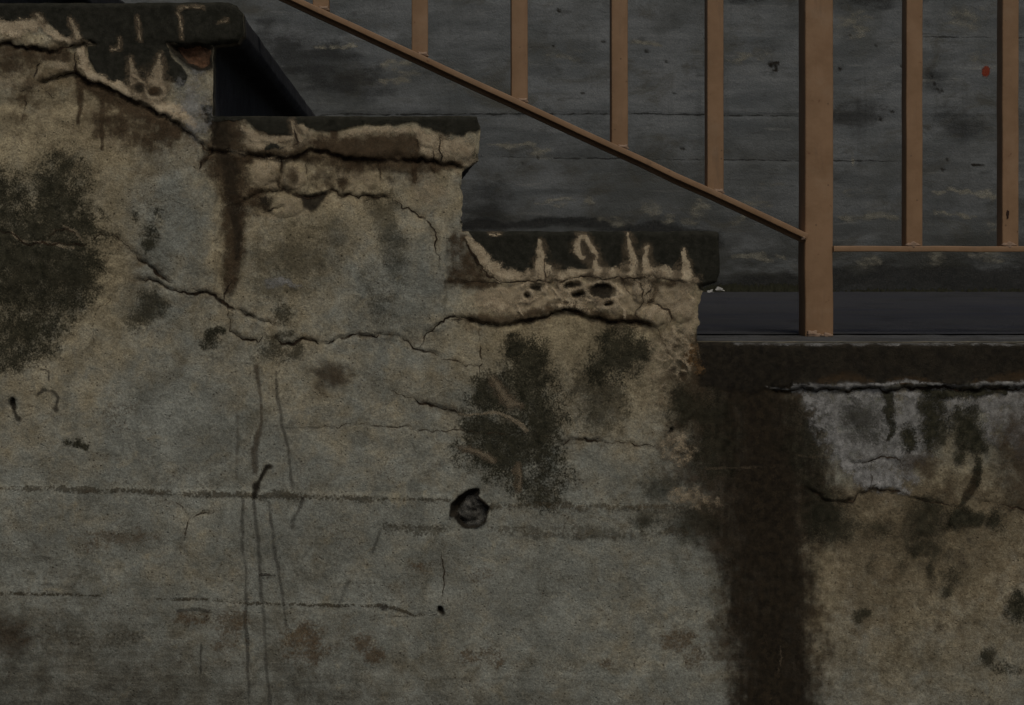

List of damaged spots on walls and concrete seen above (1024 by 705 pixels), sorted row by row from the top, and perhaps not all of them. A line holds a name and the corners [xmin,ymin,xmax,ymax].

peeling [0,2,244,85]
water stain [175,4,205,41]
water stain [0,13,474,294]
peeling [200,104,480,150]
crack [0,41,689,375]
water stain [0,148,115,411]
spalling [563,282,615,307]
peeling [460,221,720,291]
water stain [446,217,1024,705]
crack [814,456,961,509]